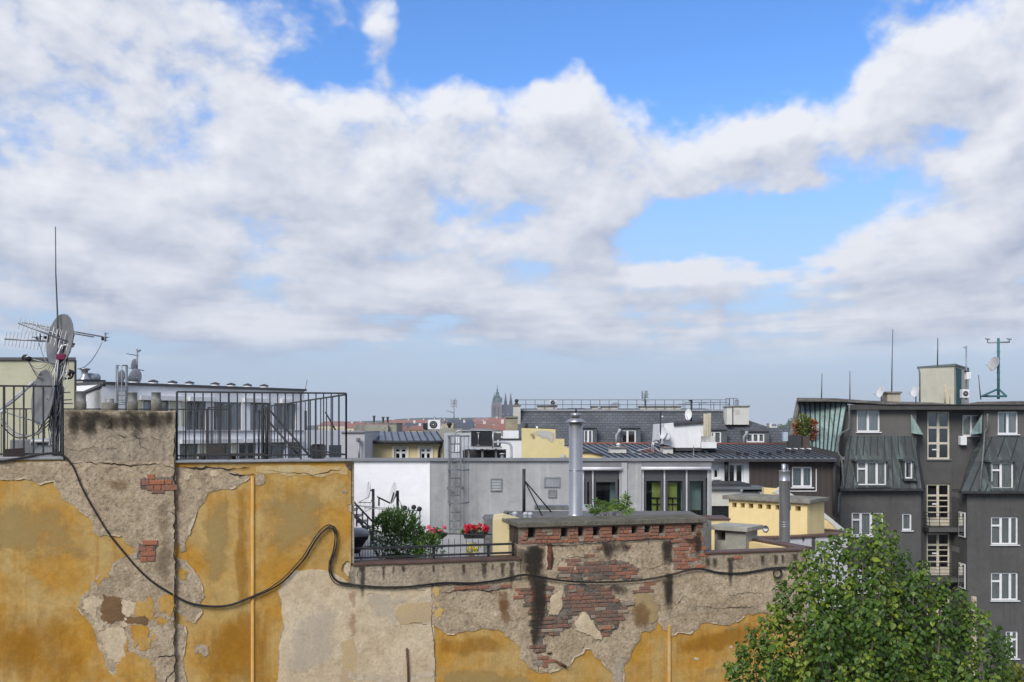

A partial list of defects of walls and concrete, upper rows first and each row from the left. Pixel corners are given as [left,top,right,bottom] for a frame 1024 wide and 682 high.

leakage [70,411,172,433]
crack [65,416,252,682]
spalling [0,461,351,682]
leakage [482,545,548,641]
spalling [277,535,808,682]
leakage [662,540,673,603]